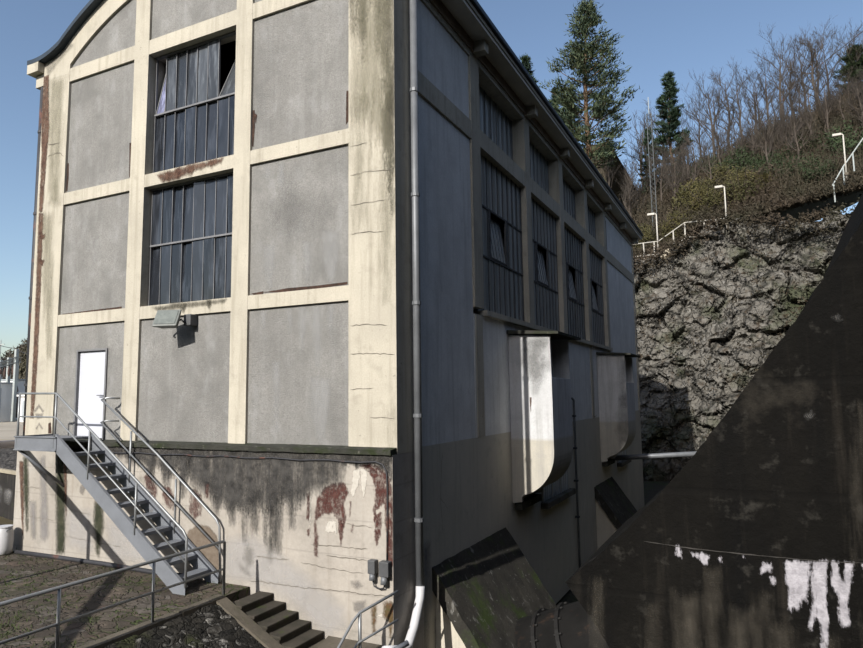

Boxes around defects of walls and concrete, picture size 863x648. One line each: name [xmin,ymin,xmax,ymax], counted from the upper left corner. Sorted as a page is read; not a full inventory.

water stain [351,0,394,182]
rust [157,158,222,182]
rust [30,75,49,418]
water stain [23,454,65,553]
water stain [94,502,103,554]
water stain [107,446,392,548]
peeling [306,464,393,566]